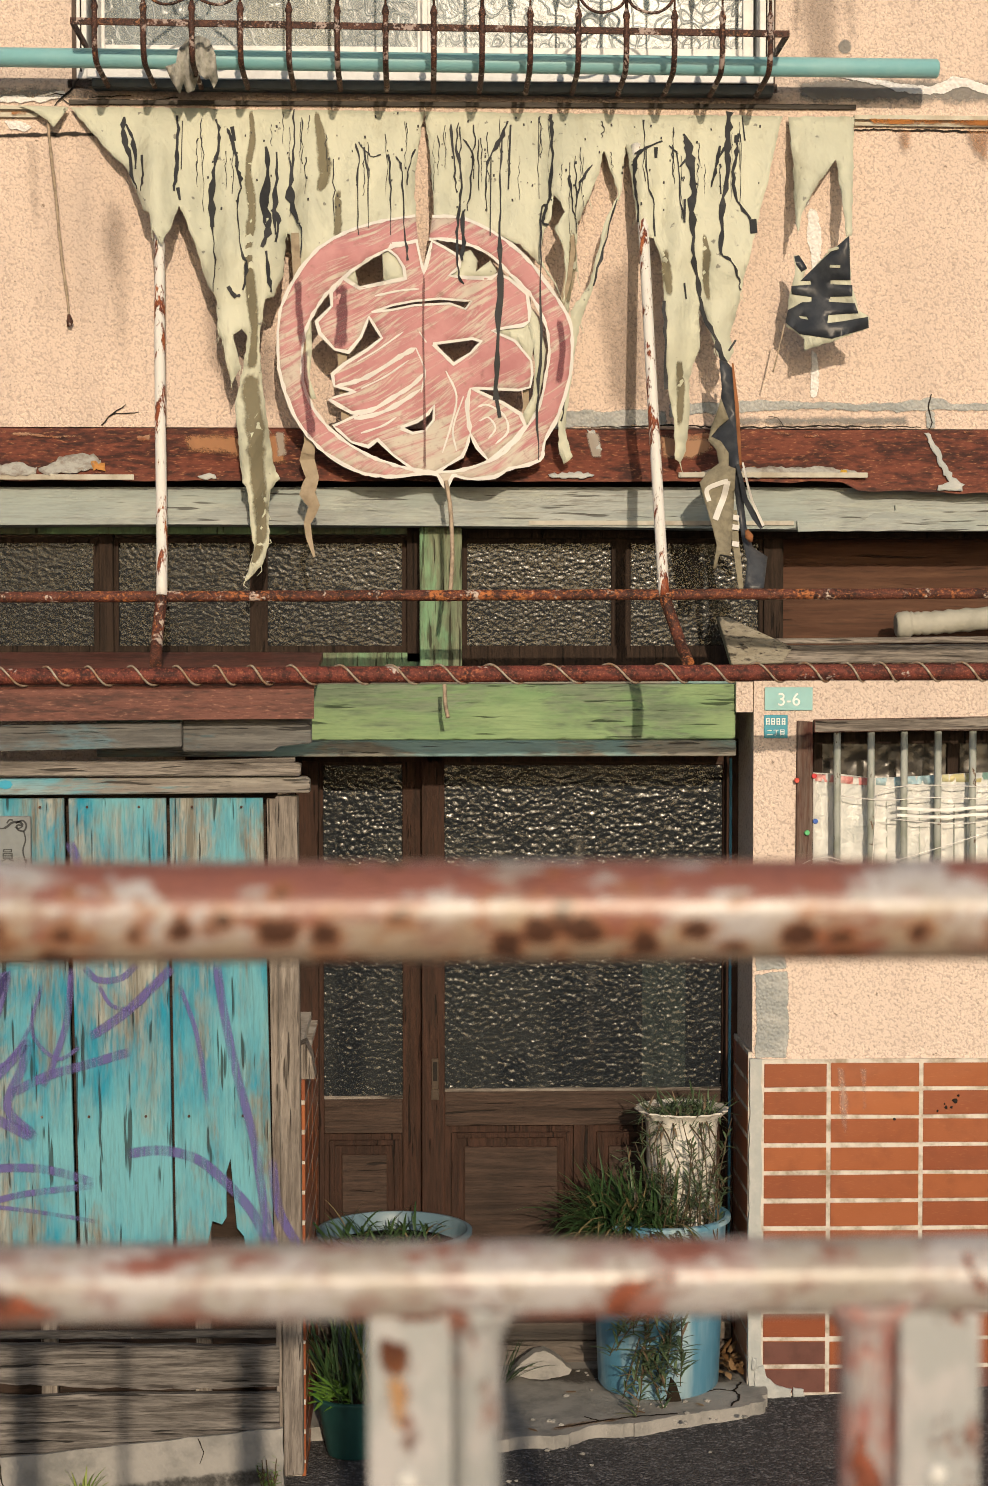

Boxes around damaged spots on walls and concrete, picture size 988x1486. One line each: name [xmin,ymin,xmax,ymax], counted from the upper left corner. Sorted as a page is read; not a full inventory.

corrosion [187,435,239,456]
corrosion [269,432,286,463]
corrosion [587,434,601,457]
corrosion [660,437,710,458]
peeling [924,433,965,491]
corrosion [964,1254,985,1292]
corrosion [0,1293,61,1319]
corrosion [605,1274,676,1316]
corrosion [379,1339,409,1425]